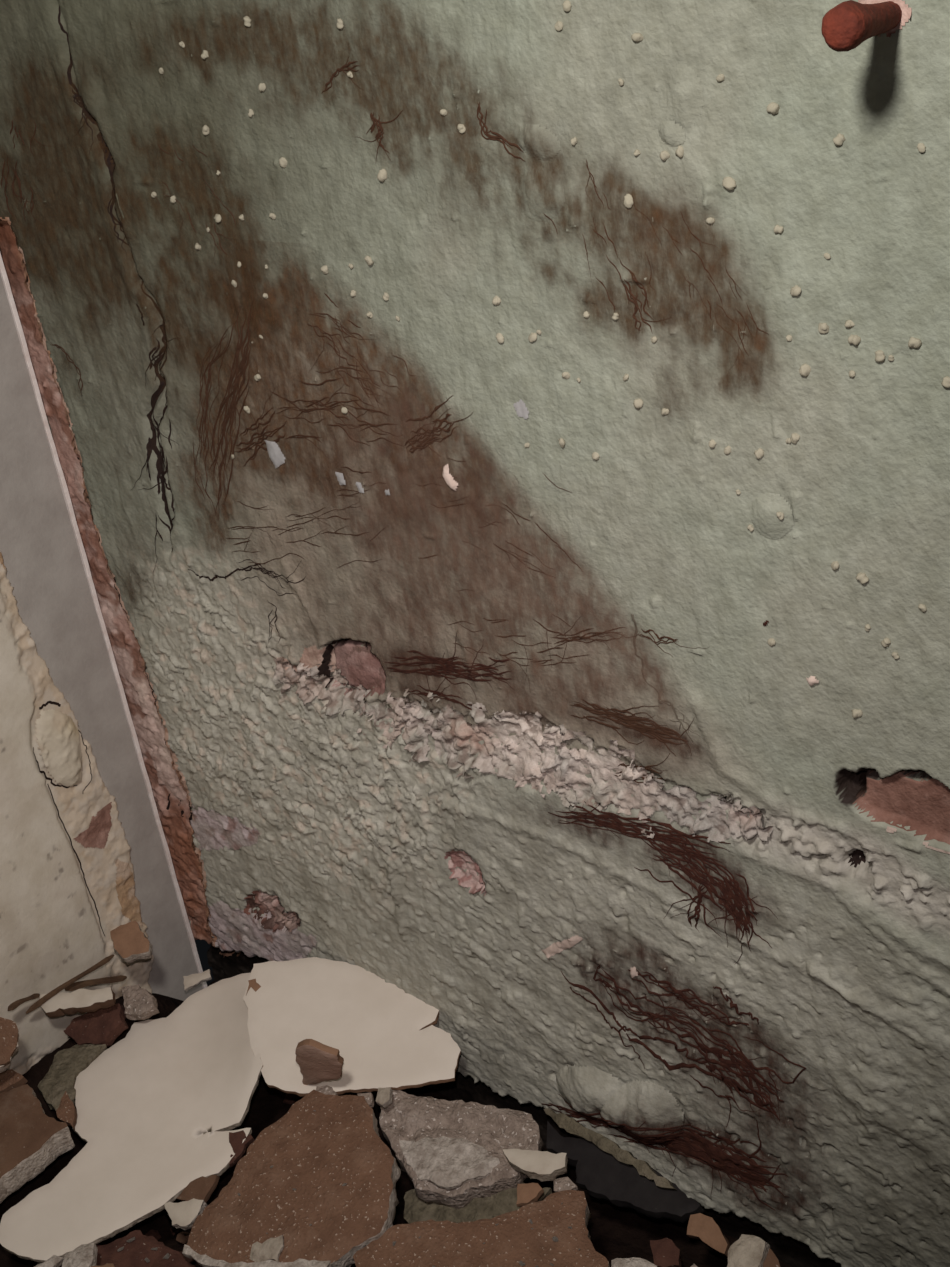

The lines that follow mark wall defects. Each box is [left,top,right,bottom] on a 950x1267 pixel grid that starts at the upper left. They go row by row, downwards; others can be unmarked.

crack [58,6,306,643]
peeling [0,217,317,961]
corrosion [386,633,511,710]
spalling [444,850,486,896]
spalling [272,638,773,843]
corrosion [552,617,706,656]
corrosion [571,699,699,783]
corrosion [548,801,778,965]
flaking render [853,768,950,854]
corrosion [541,946,806,1213]